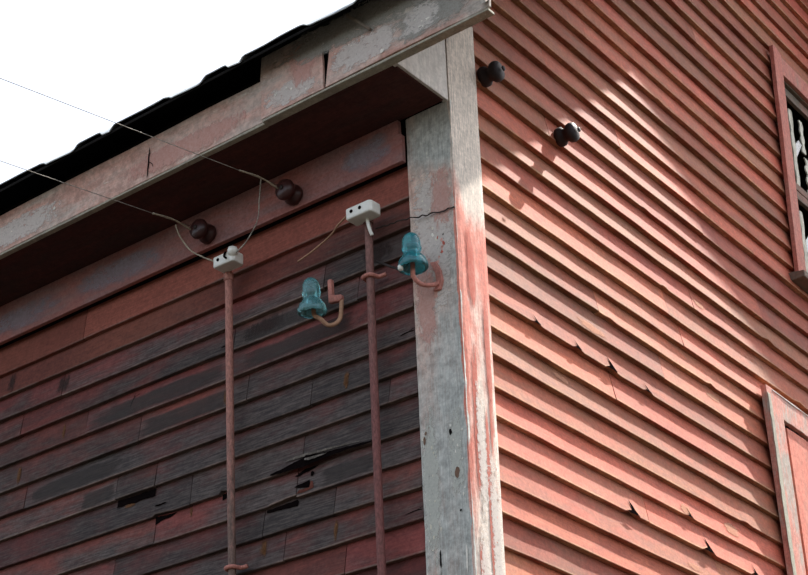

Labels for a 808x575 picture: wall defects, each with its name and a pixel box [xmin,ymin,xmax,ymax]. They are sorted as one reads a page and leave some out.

peeling [0,201,60,248]
peeling [411,169,455,343]
peeling [422,407,442,570]
peeling [466,230,504,575]